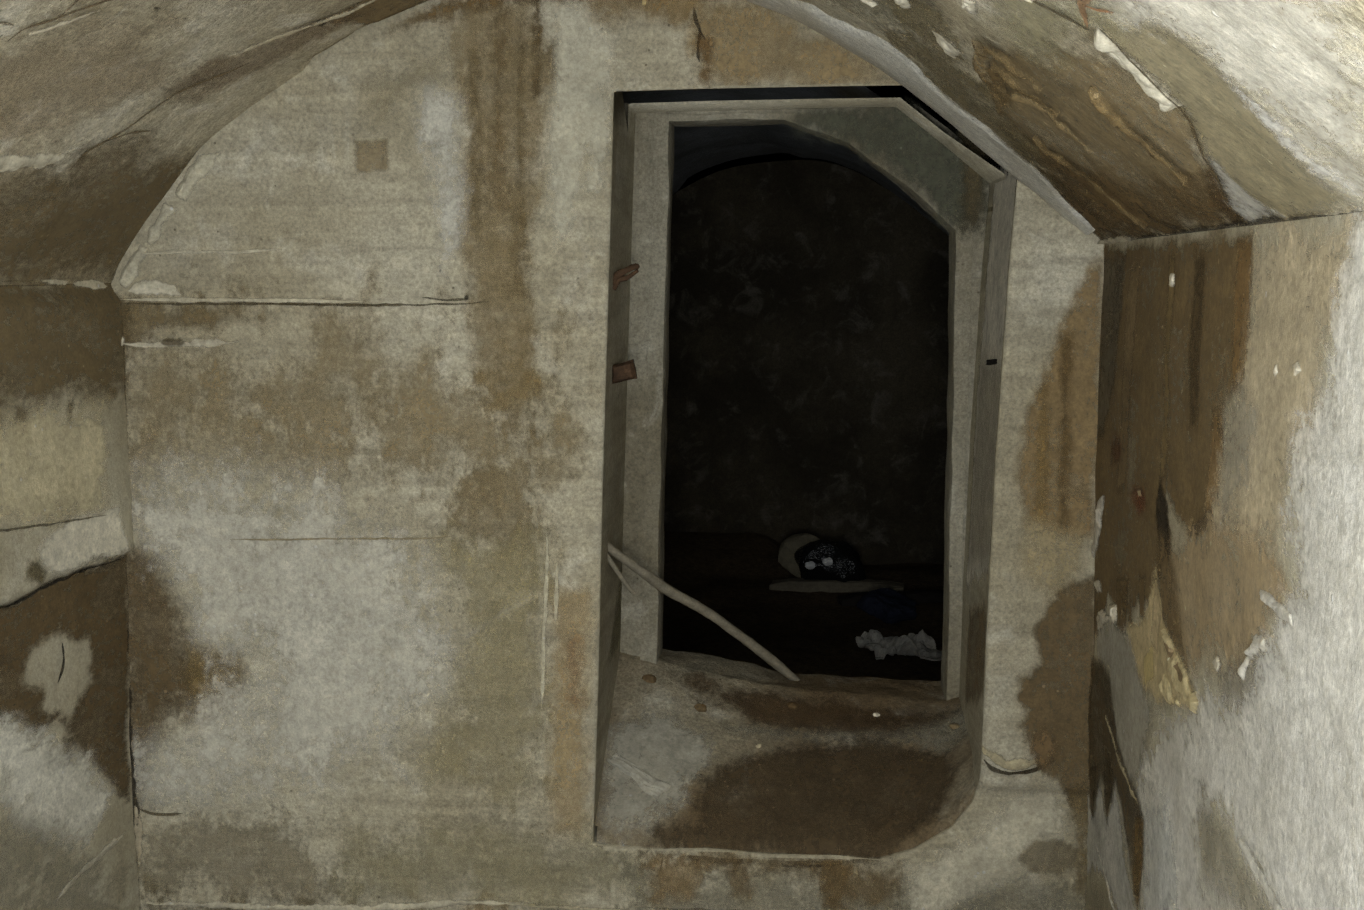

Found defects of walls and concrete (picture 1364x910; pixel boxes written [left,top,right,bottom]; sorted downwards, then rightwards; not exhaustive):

crack [0,0,110,41]
flaking render [894,0,911,9]
flaking render [932,30,962,59]
spalling [1094,29,1183,112]
damp [0,137,240,447]
damp [981,17,1357,910]
crack [0,515,105,532]
crack [0,558,123,608]
damp [0,315,582,846]
spalling [1237,634,1271,680]
crack [129,688,182,837]
damp [653,673,957,906]